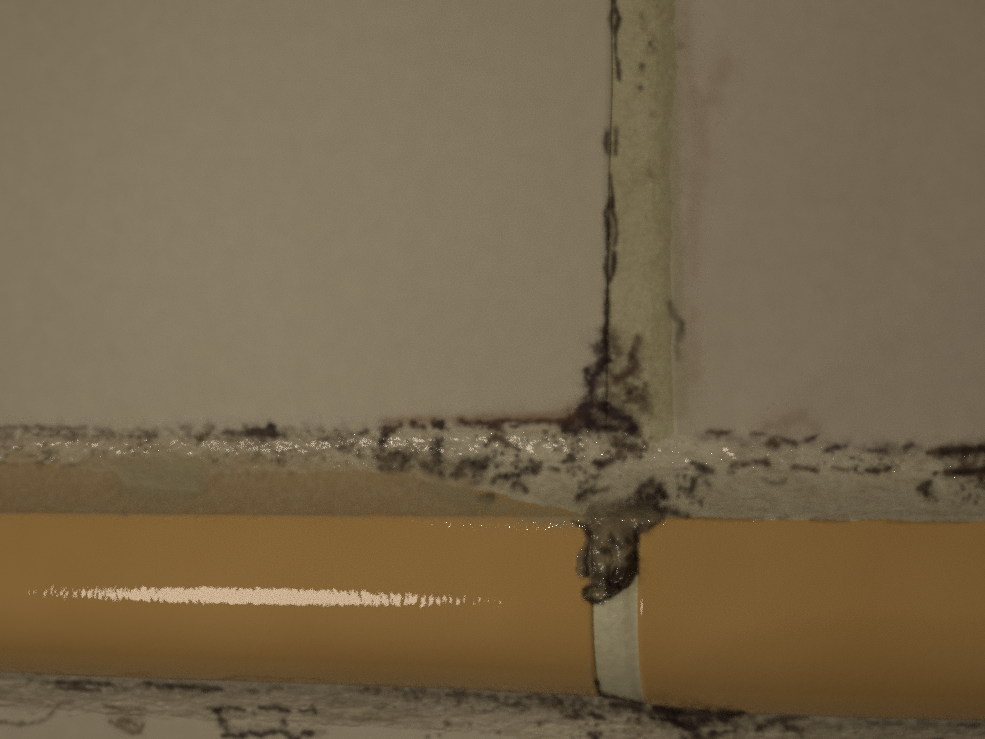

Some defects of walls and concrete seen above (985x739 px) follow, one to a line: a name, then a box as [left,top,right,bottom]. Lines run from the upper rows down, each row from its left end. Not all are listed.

damp [604,184,616,281]
damp [246,423,279,437]
damp [927,445,985,455]
damp [679,462,713,493]
damp [918,468,985,495]
damp [572,479,688,604]
damp [213,706,313,739]
damp [595,681,745,739]